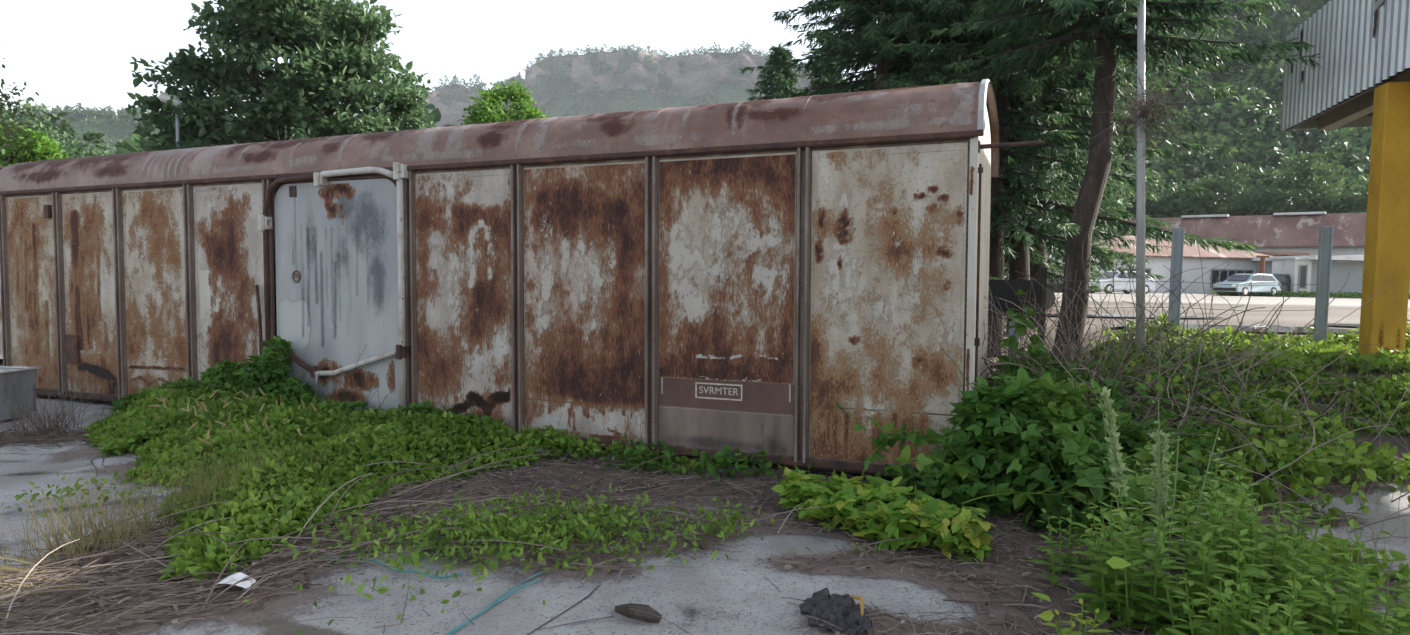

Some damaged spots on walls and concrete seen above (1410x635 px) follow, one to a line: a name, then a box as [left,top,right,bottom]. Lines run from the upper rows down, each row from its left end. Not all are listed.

corrosion [228,129,415,163]
corrosion [447,119,538,148]
corrosion [583,109,656,137]
corrosion [699,85,932,128]
corrosion [318,183,355,225]
corrosion [0,150,266,395]
corrosion [416,154,795,441]
corrosion [810,149,974,466]
corrosion [318,359,395,403]